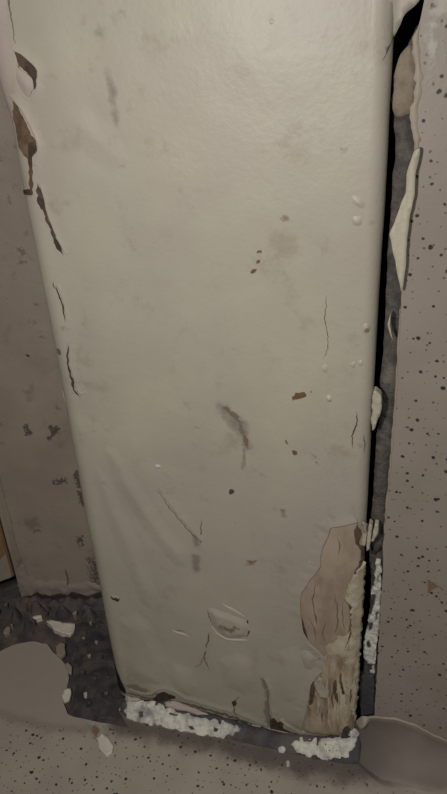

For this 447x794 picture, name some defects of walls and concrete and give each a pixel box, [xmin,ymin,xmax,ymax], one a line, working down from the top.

crack [36,183,70,254]
peeling [389,147,421,291]
crack [53,283,72,321]
crack [57,343,86,399]
peeling [124,511,379,738]
water stain [116,719,374,778]